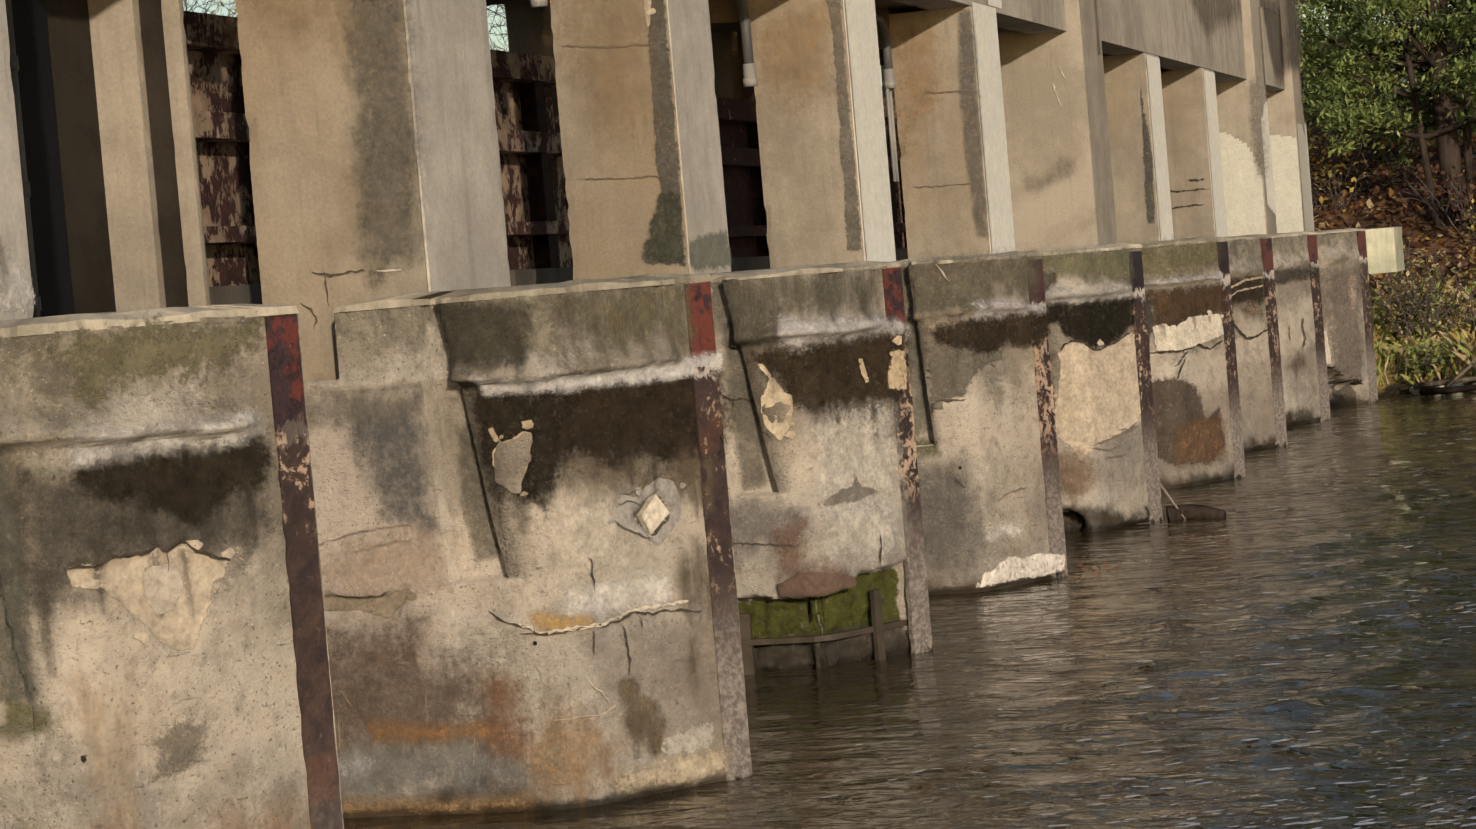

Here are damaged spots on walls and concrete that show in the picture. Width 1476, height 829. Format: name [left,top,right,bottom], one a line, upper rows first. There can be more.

leakage [930,262,1363,383]
peeling [488,420,534,496]
peeling [756,363,796,440]
peeling [1053,310,1224,461]
leakage [1152,378,1226,467]
leakage [16,411,270,638]
peeling [66,540,235,651]
crack [335,591,387,599]
spalling [509,600,689,635]
leakage [741,621,906,672]